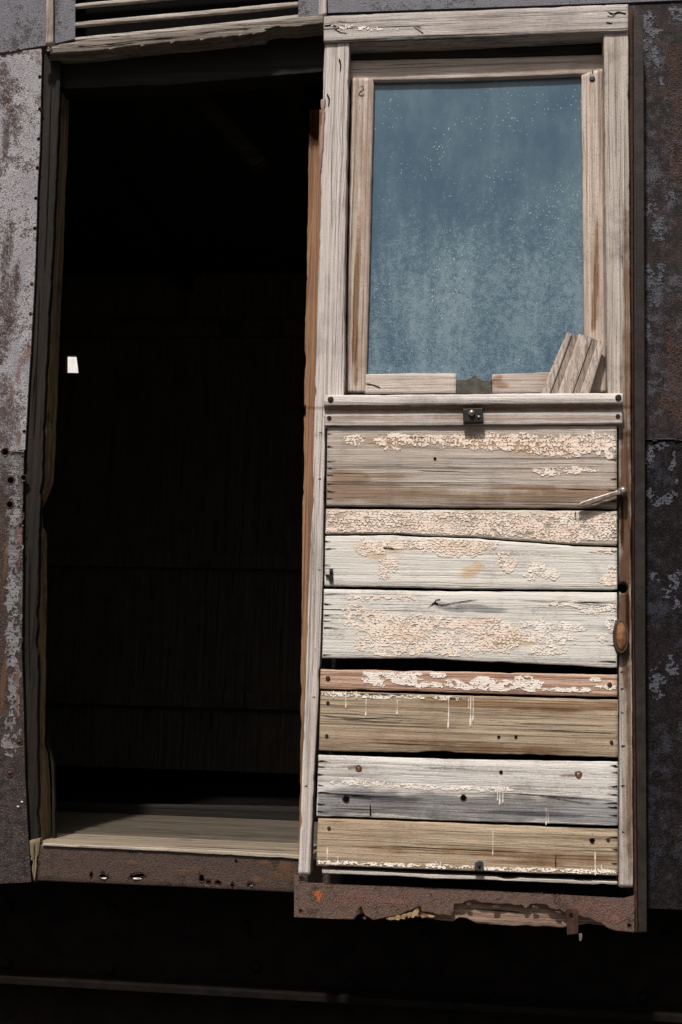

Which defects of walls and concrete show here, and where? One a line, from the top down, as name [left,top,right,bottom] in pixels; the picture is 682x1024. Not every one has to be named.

corrosion [0,61,20,162]
corrosion [0,221,31,450]
peeling [344,430,616,476]
corrosion [0,475,24,670]
peeling [326,510,616,586]
peeling [336,594,616,657]
peeling [322,671,616,701]
corrosion [341,893,634,933]